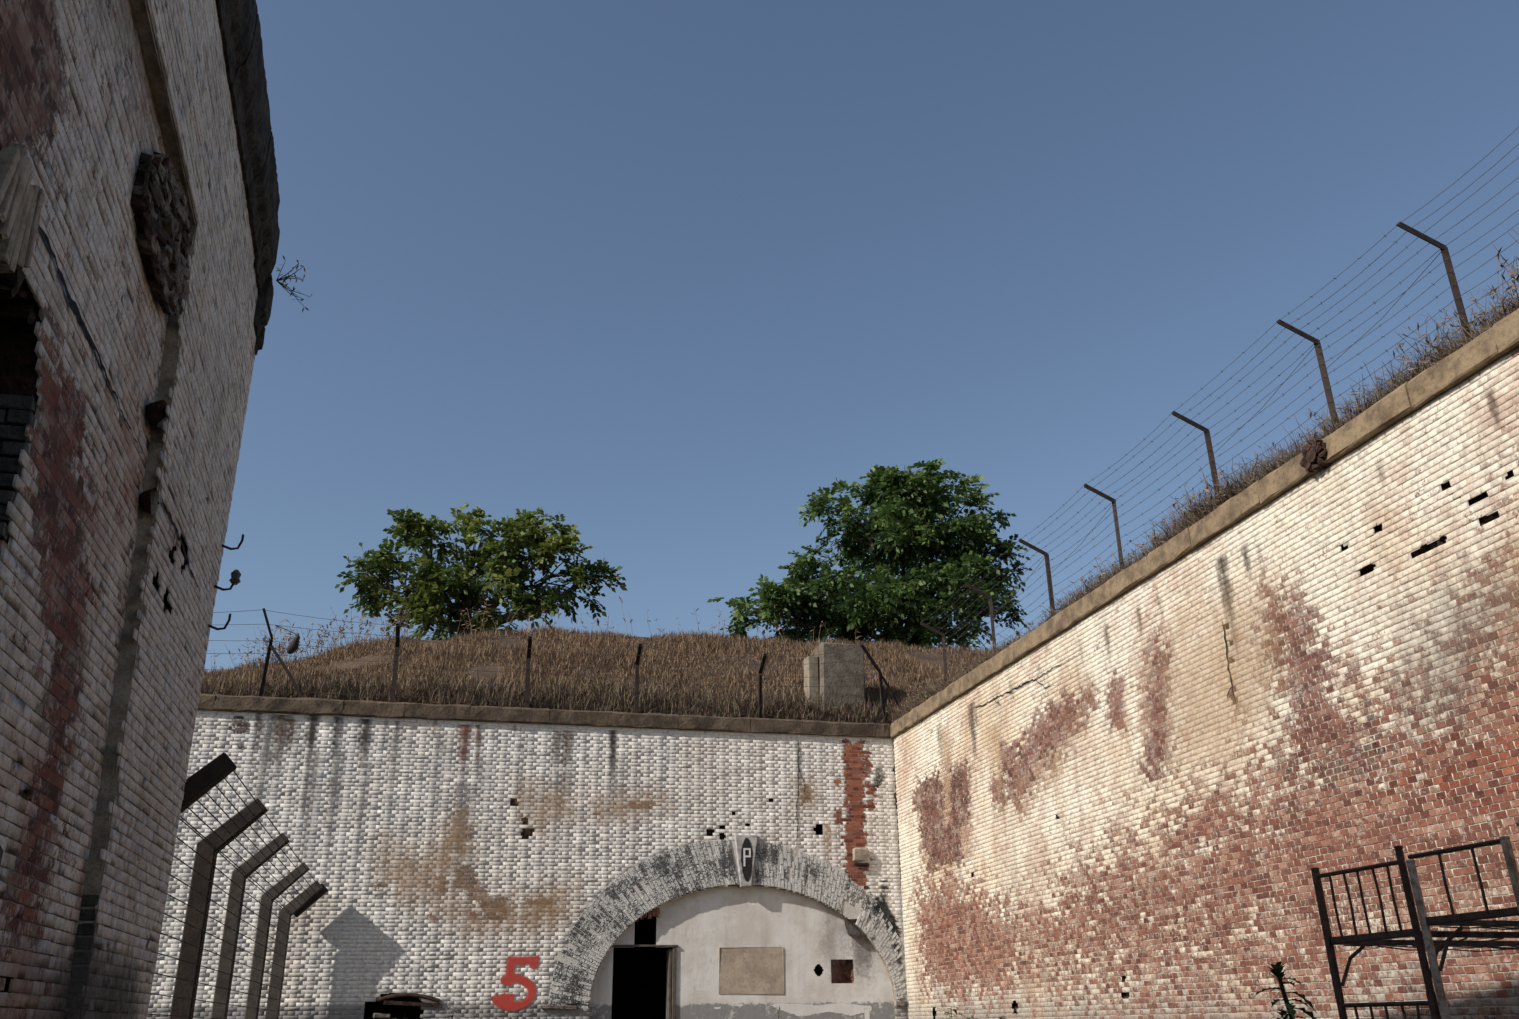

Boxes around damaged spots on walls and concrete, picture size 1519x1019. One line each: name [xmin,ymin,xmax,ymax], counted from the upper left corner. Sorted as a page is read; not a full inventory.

peeling [0,0,68,194]
peeling [0,269,104,984]
water stain [254,713,370,821]
water stain [554,730,572,766]
peeling [829,428,1519,1019]